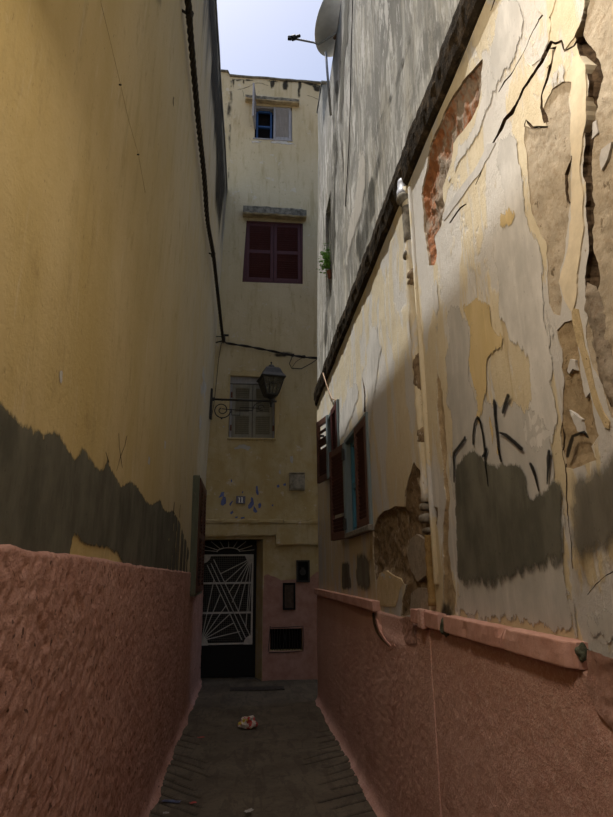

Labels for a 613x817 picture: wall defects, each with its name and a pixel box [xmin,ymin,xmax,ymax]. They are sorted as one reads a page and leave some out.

crack [500,37,603,133]
crack [565,131,600,289]
peeling [374,0,613,644]
flaking render [586,650,613,729]